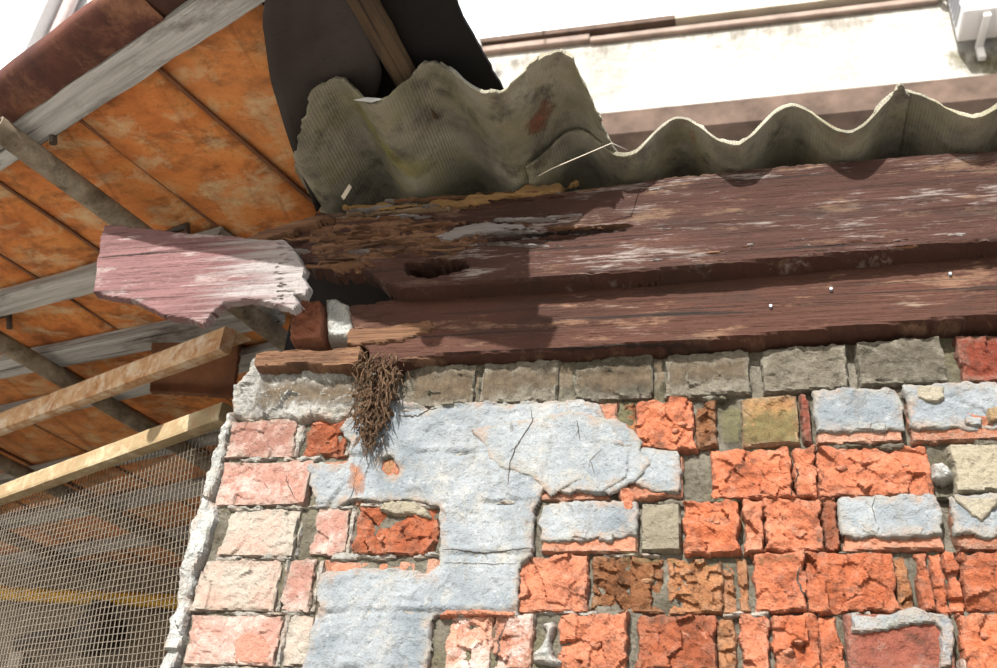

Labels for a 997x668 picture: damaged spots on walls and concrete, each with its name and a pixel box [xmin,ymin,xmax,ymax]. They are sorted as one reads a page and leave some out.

crack [508,409,533,482]
flaking render [302,381,997,668]
spalling [235,633,270,665]